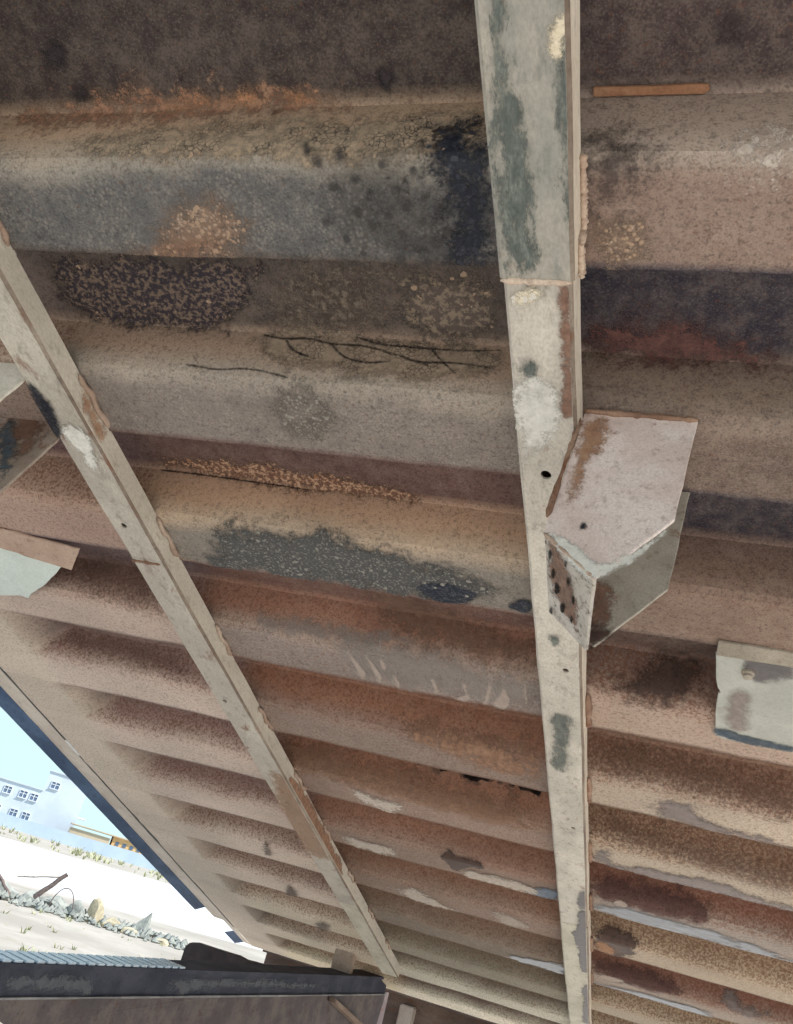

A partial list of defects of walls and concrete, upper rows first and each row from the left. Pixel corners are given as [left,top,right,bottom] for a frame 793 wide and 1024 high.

rust [16,72,335,134]
peeling [51,109,500,346]
crack [187,327,501,382]
rust [556,286,776,500]
peeling [163,457,421,504]
damp [612,647,704,709]
rust [404,716,543,782]